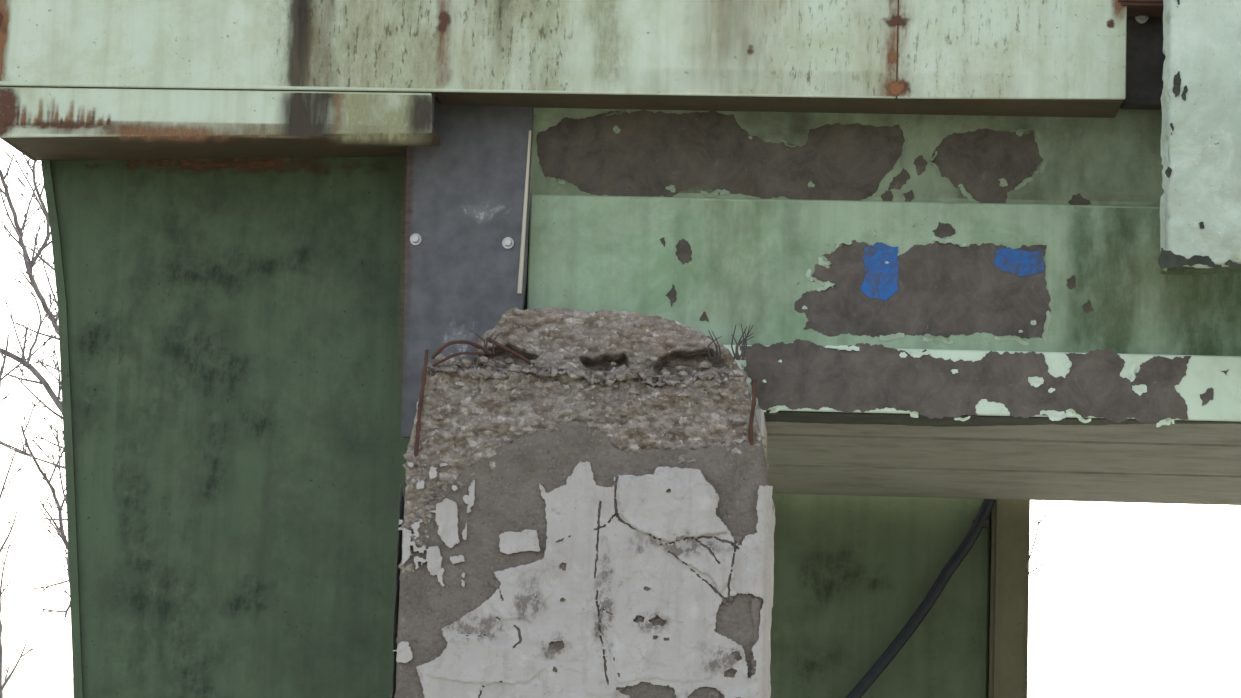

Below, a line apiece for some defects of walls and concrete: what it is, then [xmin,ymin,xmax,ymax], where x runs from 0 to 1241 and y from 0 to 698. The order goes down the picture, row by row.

corrosion [0,0,208,140]
water stain [285,0,420,142]
corrosion [886,10,909,96]
corrosion [242,124,289,137]
peeling [536,109,1047,204]
peeling [1068,194,1091,205]
spalling [393,222,1241,698]
crack [478,579,522,648]
crack [556,458,760,692]